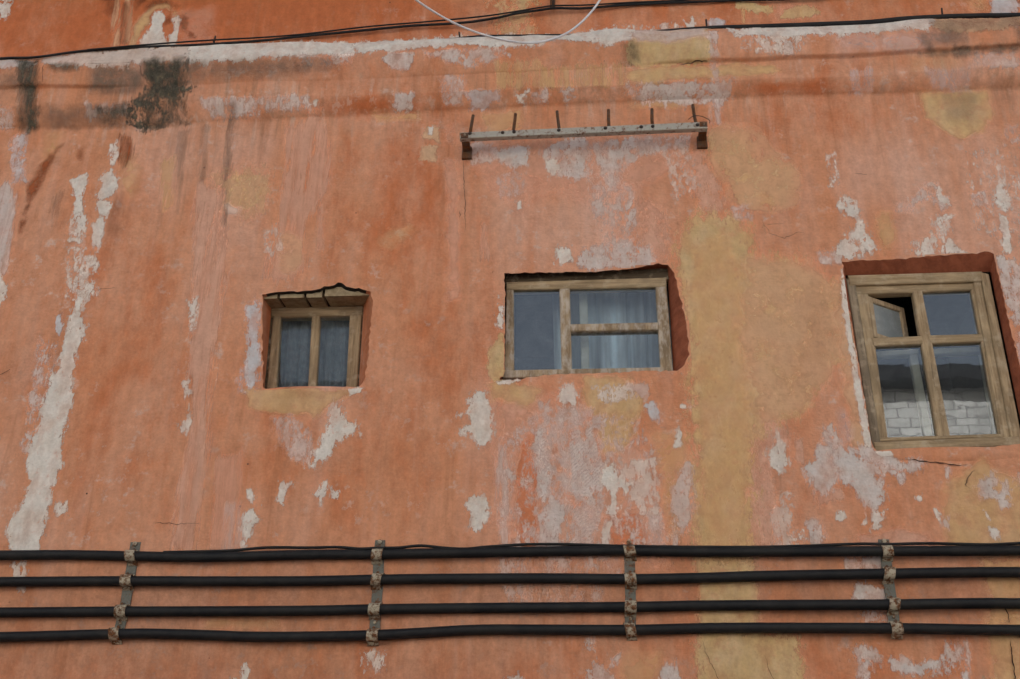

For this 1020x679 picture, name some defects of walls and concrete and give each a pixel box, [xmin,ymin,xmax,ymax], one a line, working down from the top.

leakage [17,60,38,134]
leakage [90,0,197,165]
peeling [0,0,1020,124]
leakage [929,47,971,56]
peeling [967,138,1020,349]
peeling [4,141,121,593]
peeling [239,300,362,471]
peeling [455,134,929,679]
peeling [933,462,1020,546]
peeling [852,642,970,679]
peeling [982,563,1020,679]
crack [1005,609,1016,679]